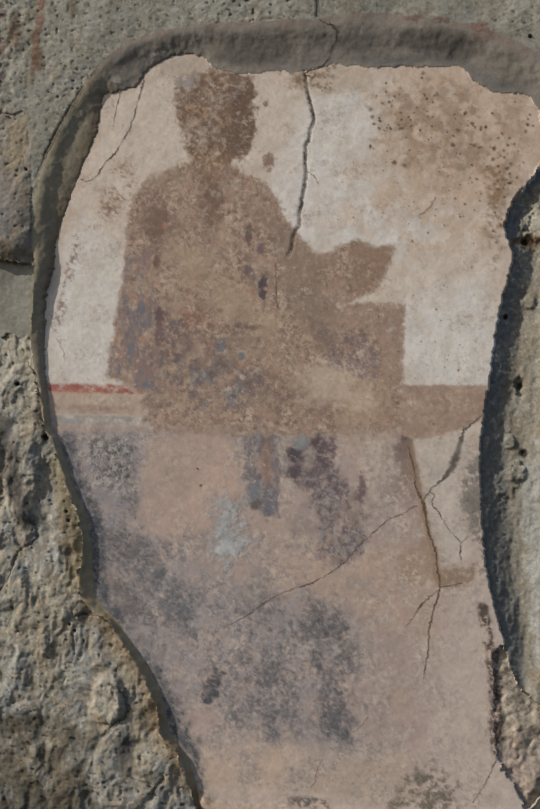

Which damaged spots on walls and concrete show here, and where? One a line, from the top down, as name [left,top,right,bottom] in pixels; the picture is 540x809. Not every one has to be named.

crack [81,79,144,181]
crack [290,0,337,252]
crack [224,416,480,672]
spalling [461,166,540,809]